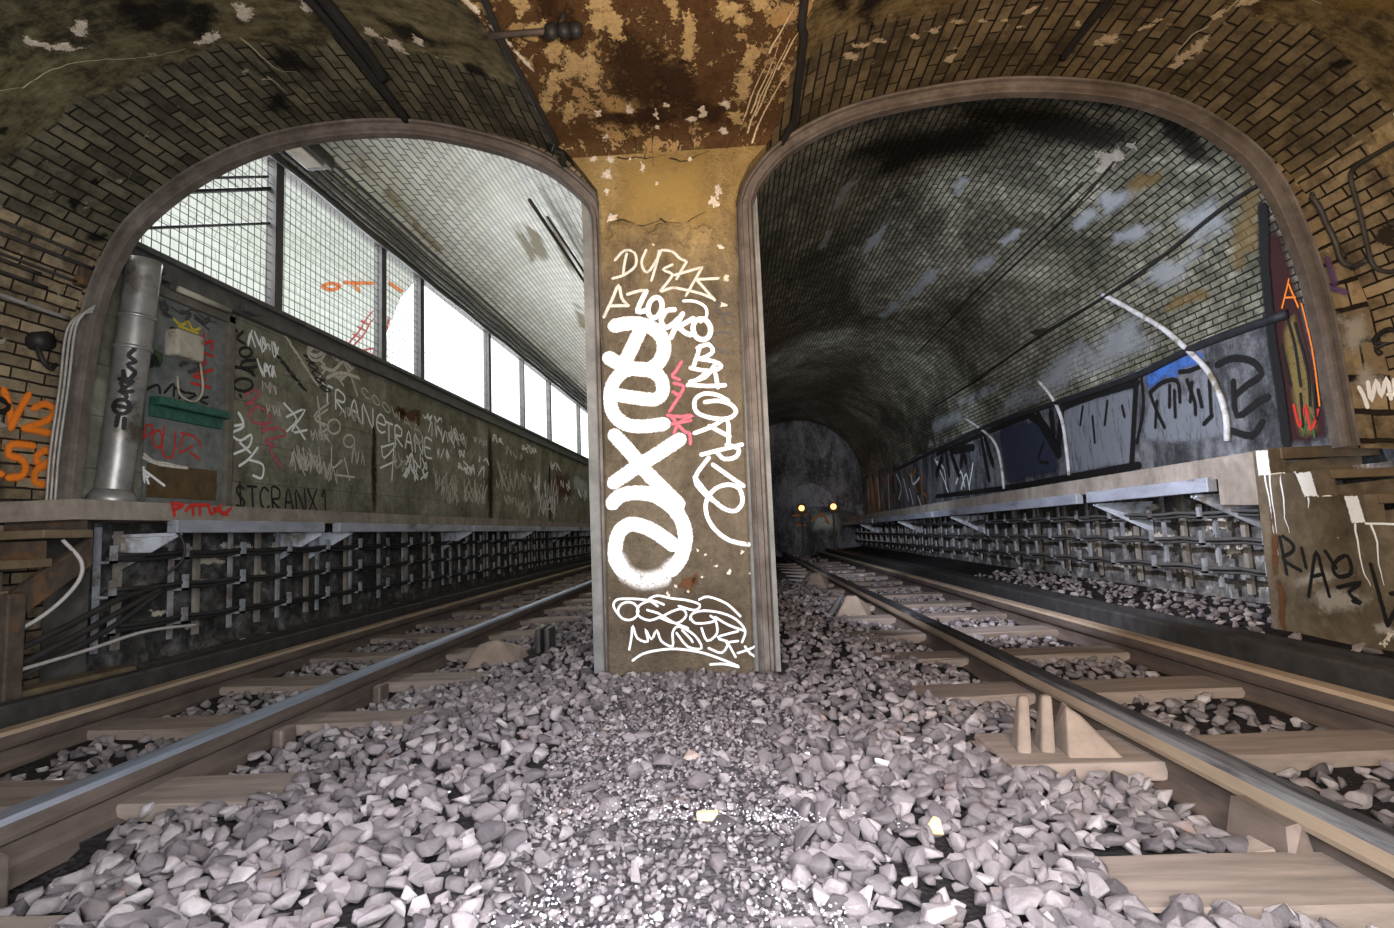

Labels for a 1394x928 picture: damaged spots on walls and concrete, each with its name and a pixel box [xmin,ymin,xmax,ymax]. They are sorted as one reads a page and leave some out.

spalling [231,2,255,22]
spalling [21,19,89,52]
spalling [362,26,427,57]
peeling [663,0,699,85]
peeling [462,0,627,126]
water stain [594,29,722,127]
peeling [686,0,772,135]
water stain [742,0,812,144]
water stain [1075,194,1132,228]
water stain [1116,227,1142,239]
water stain [1182,211,1220,238]
water stain [1153,264,1181,281]